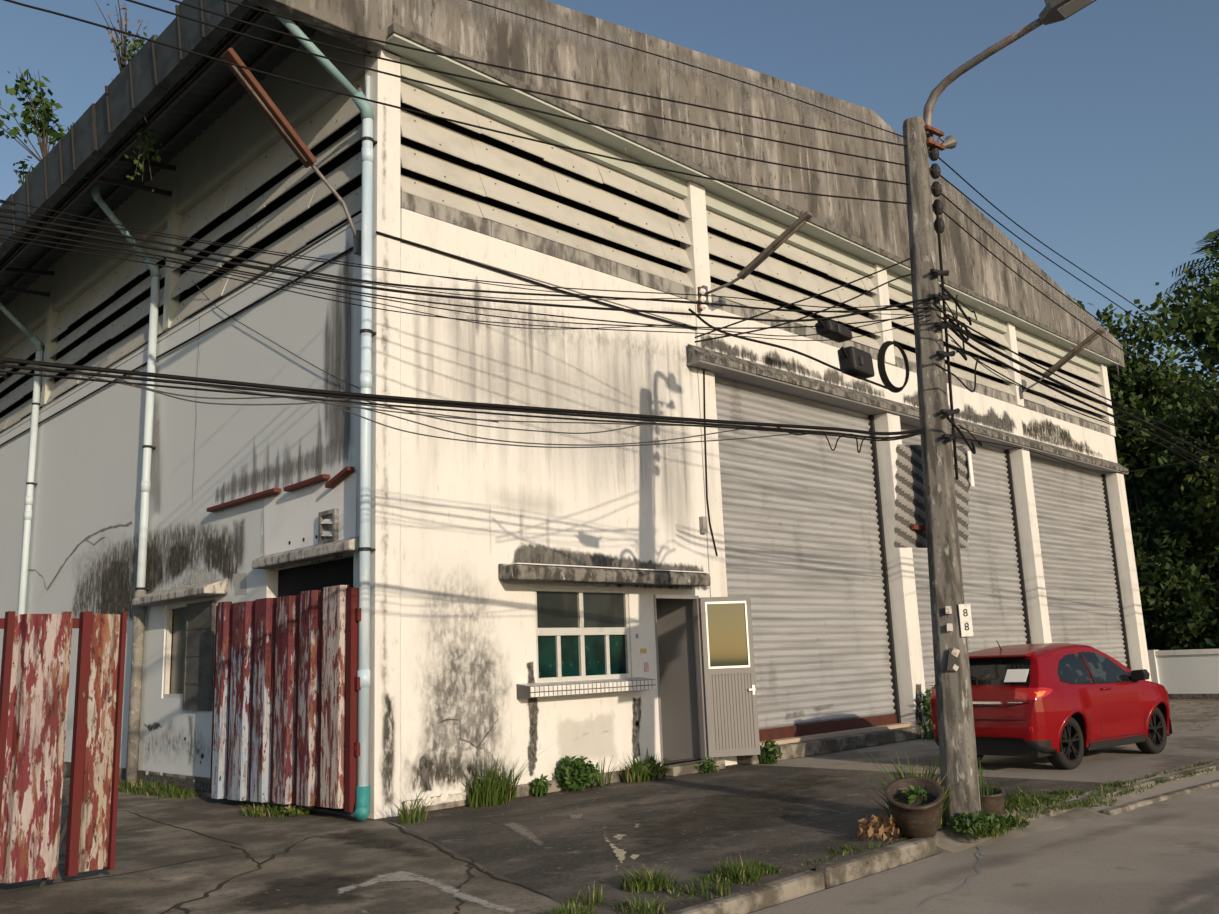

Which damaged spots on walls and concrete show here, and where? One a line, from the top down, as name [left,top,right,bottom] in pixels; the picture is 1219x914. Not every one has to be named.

damp [217,253,350,504]
mould [701,336,884,396]
mould [948,405,1099,455]
damp [74,522,244,618]
damp [413,636,501,791]